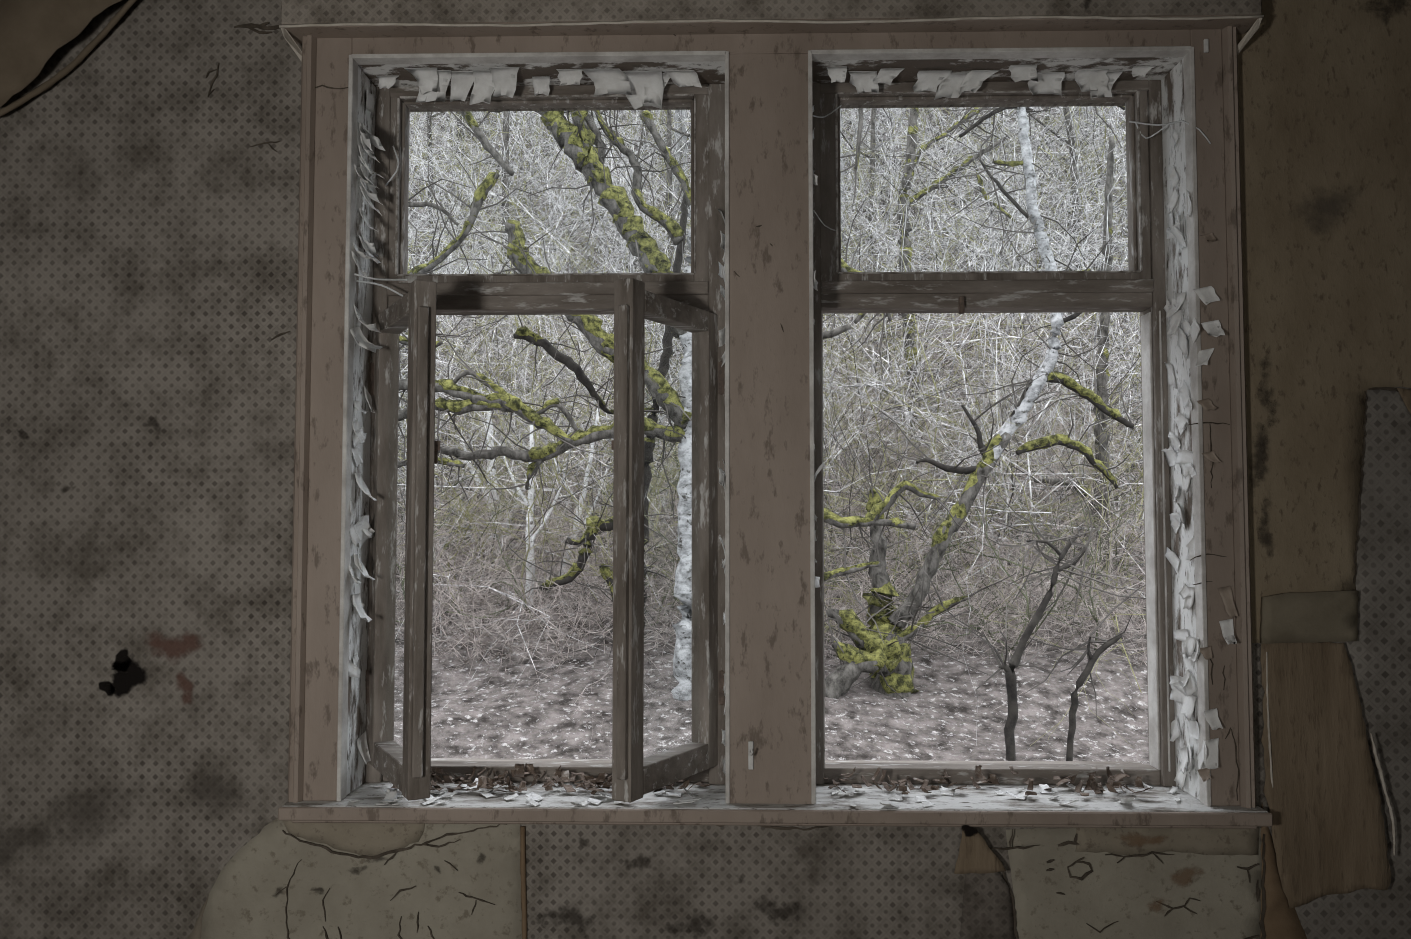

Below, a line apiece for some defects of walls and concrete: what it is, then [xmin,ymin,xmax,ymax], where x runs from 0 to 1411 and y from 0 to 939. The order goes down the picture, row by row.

peeling [827,65,1156,100]
peeling [351,67,702,277]
peeling [1117,0,1411,803]
peeling [348,385,376,622]
peeling [421,778,626,807]
peeling [994,782,1084,805]
spalling [201,818,522,939]
crack [276,824,507,939]
crack [988,829,1174,939]
spalling [1006,826,1307,939]
crack [1156,898,1200,916]
crack [1237,834,1266,939]